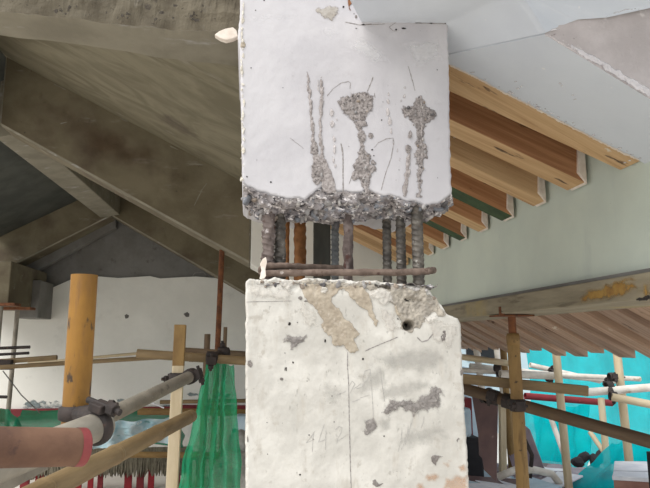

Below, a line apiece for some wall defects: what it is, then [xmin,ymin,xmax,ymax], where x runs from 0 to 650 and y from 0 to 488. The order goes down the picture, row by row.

spalling [240,143,454,230]
spalling [260,278,446,333]
crack [345,352,353,488]